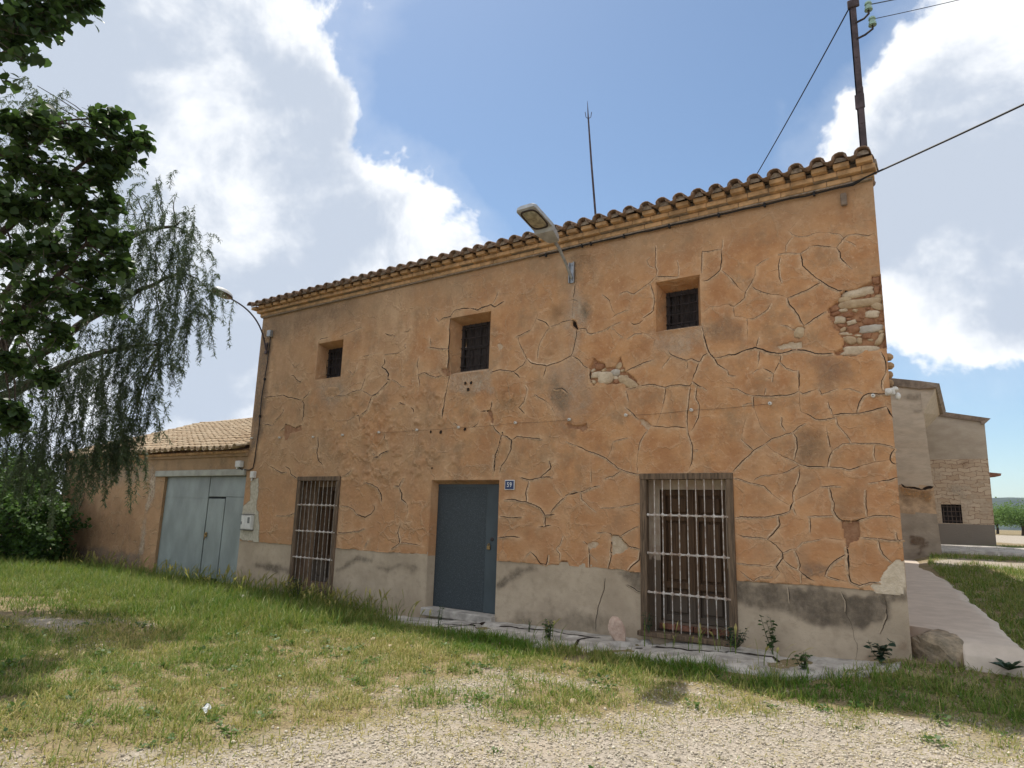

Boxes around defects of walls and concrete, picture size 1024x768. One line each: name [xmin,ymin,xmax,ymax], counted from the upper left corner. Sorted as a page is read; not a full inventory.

spalling [828,276,887,357]
spalling [590,359,639,388]
crack [264,227,934,657]
spalling [842,521,860,548]
peeling [871,560,907,595]
damp [792,590,885,628]